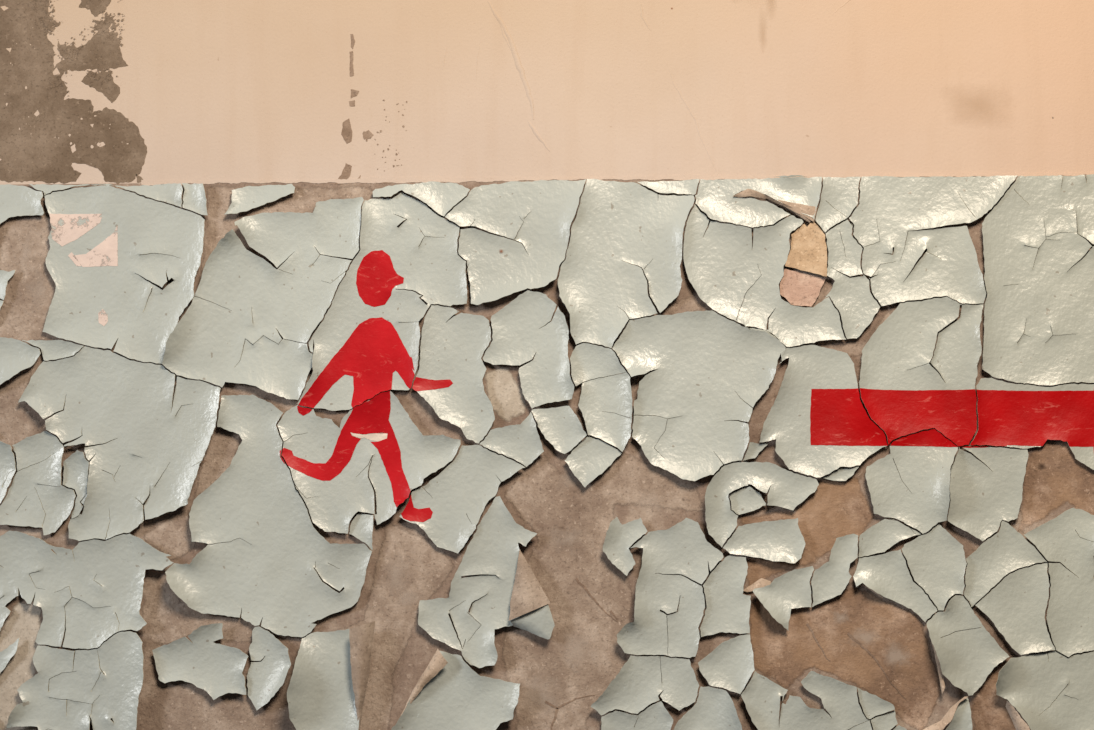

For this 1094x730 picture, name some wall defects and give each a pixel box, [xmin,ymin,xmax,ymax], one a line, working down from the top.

peeling [0,0,400,730]
flaking render [298,174,1094,730]